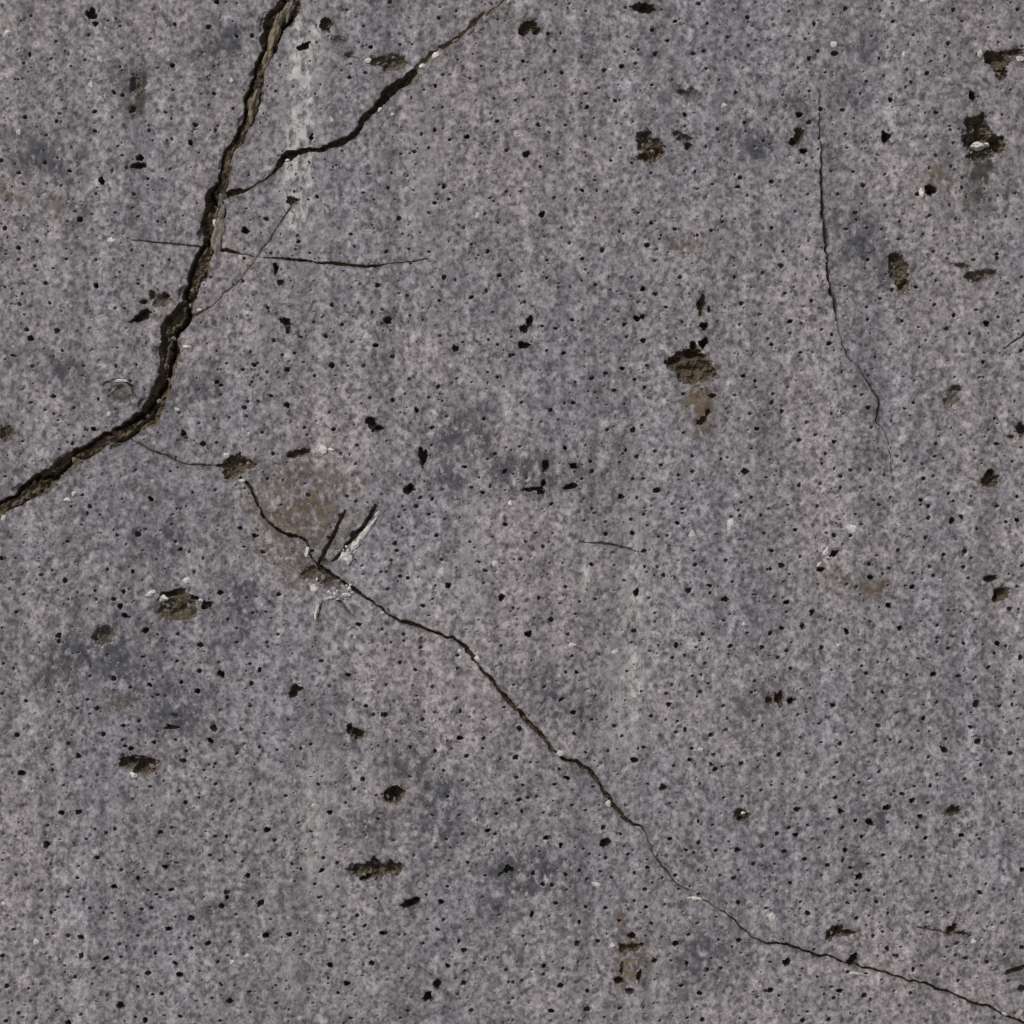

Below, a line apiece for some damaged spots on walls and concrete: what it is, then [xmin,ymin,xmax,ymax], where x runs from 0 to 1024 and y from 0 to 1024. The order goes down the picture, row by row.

crack [0,0,516,524]
crack [814,87,897,484]
crack [235,475,1024,1024]